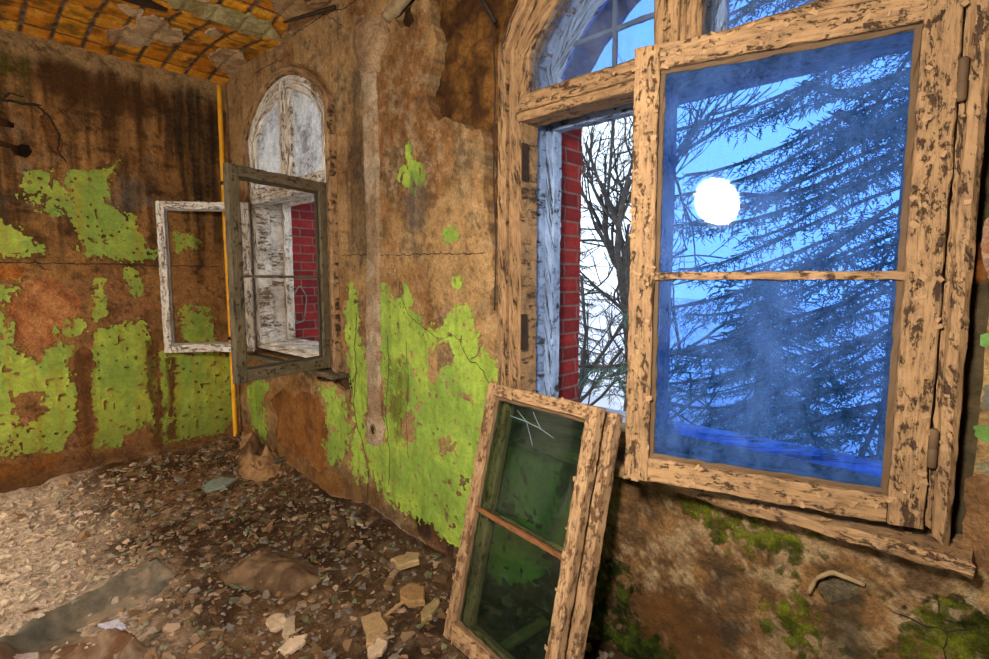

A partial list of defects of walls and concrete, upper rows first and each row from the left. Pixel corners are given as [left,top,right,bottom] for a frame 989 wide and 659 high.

water stain [38,61,164,121]
crack [0,92,66,162]
water stain [172,88,215,201]
peeling [0,0,549,580]
peeling [980,333,989,347]
peeling [973,385,989,443]
peeling [487,413,597,598]